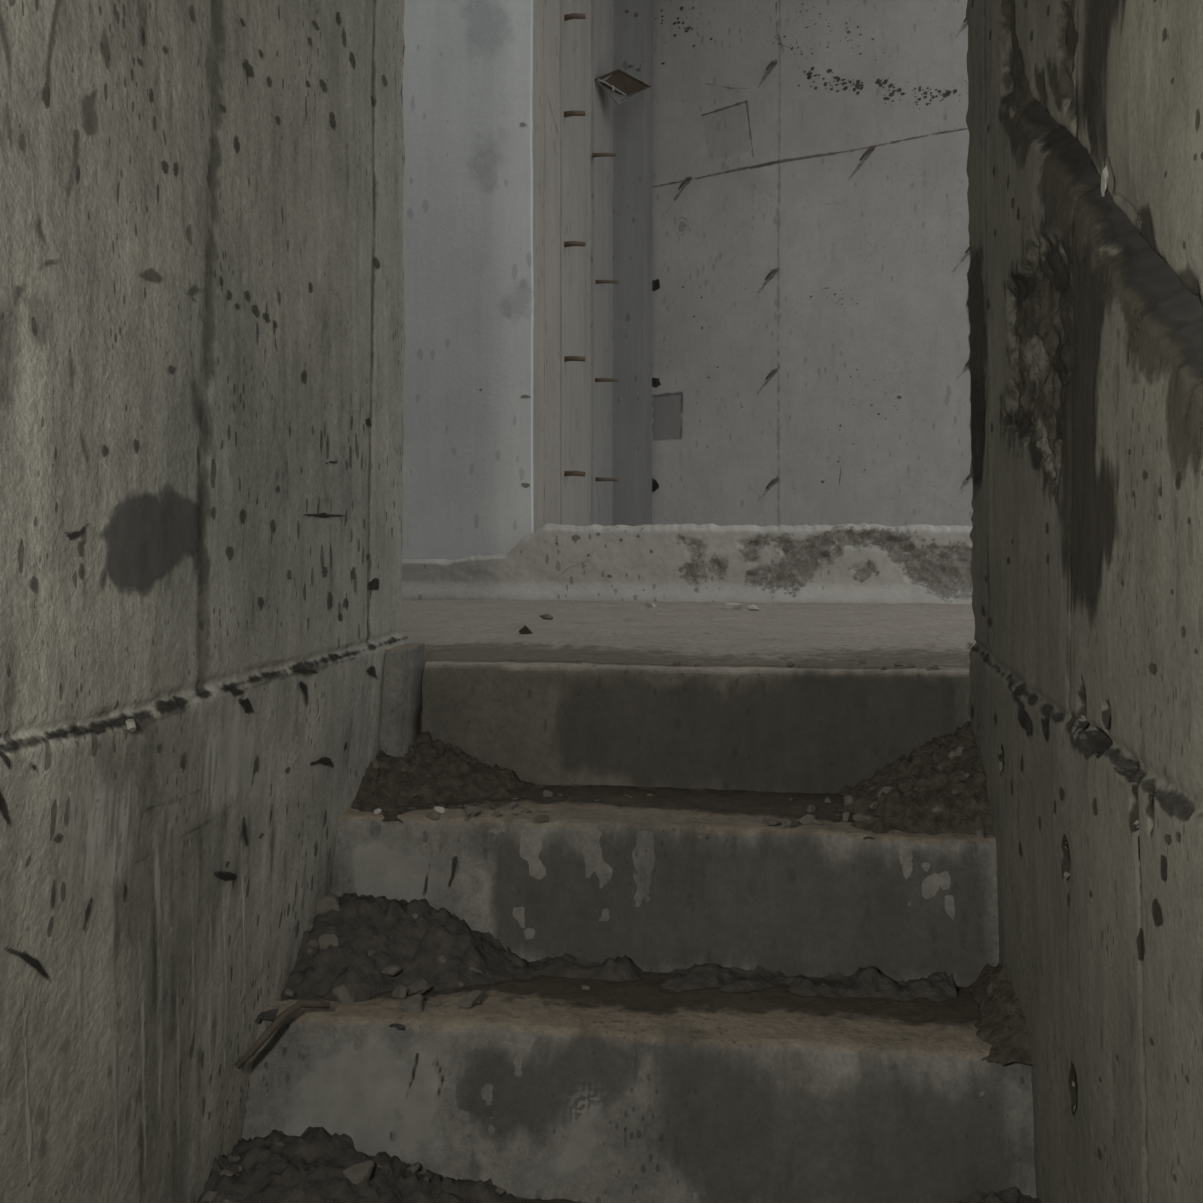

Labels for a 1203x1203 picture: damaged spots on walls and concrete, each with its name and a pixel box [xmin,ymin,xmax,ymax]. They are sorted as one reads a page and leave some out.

water stain [998,0,1203,621]
water stain [101,485,208,594]
spalling [225,686,254,713]
spalling [293,668,318,706]
spalling [310,757,334,768]